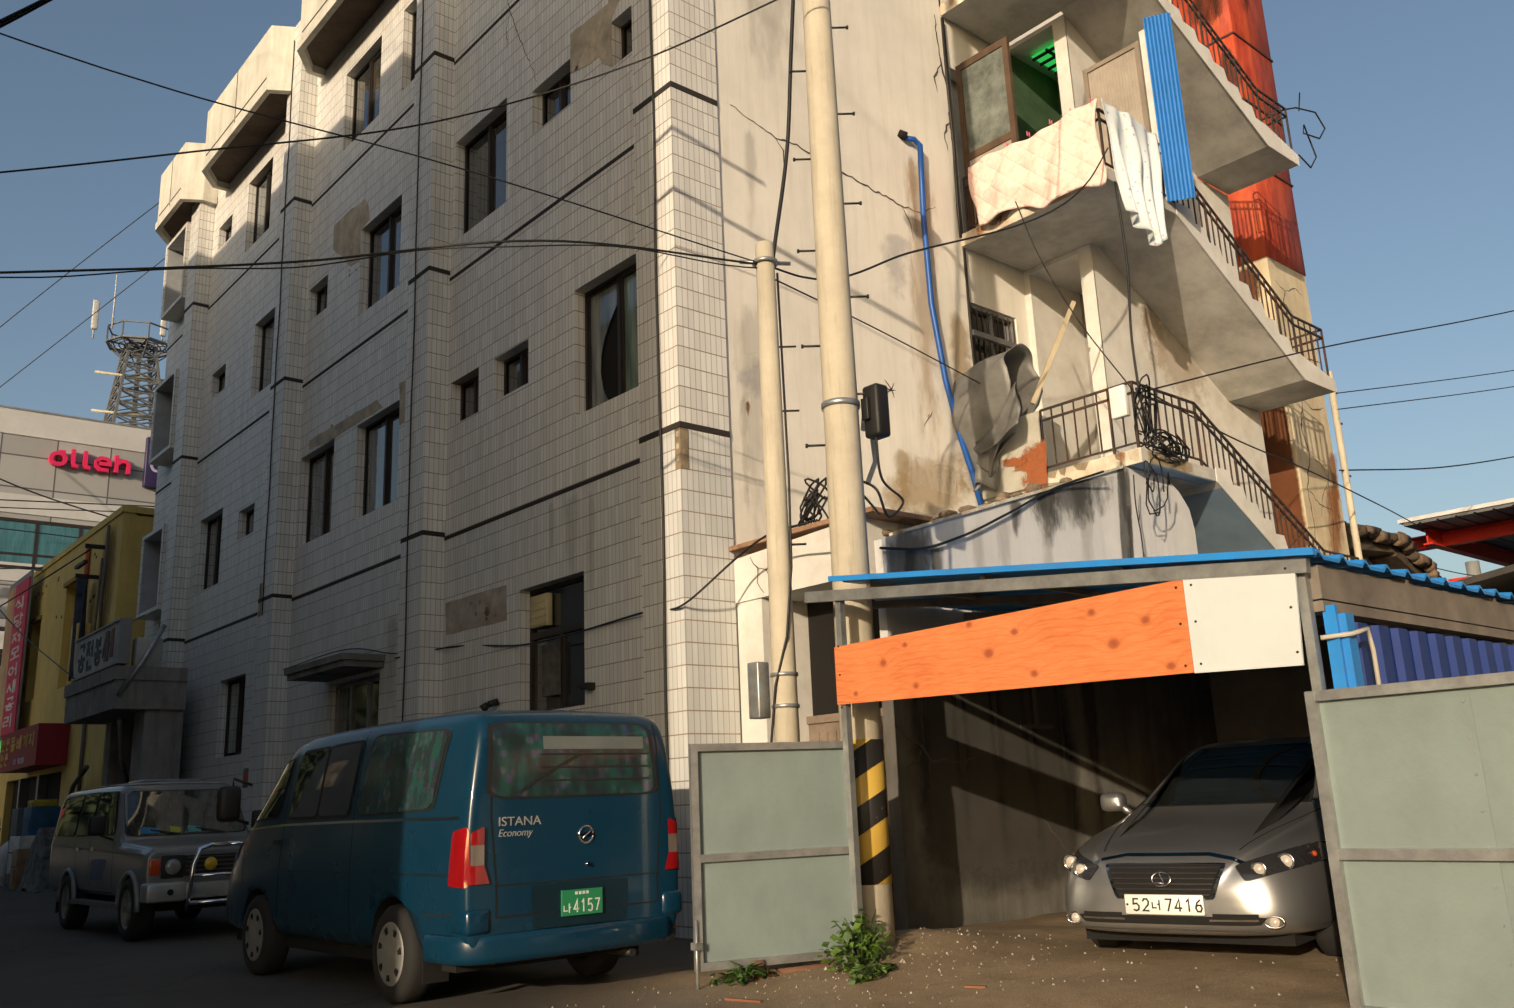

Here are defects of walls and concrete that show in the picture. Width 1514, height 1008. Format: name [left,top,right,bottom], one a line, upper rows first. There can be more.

peeling [570,0,619,73]
crack [730,104,810,164]
peeling [333,199,369,277]
crack [842,172,935,238]
corrosion [1003,440,1047,493]